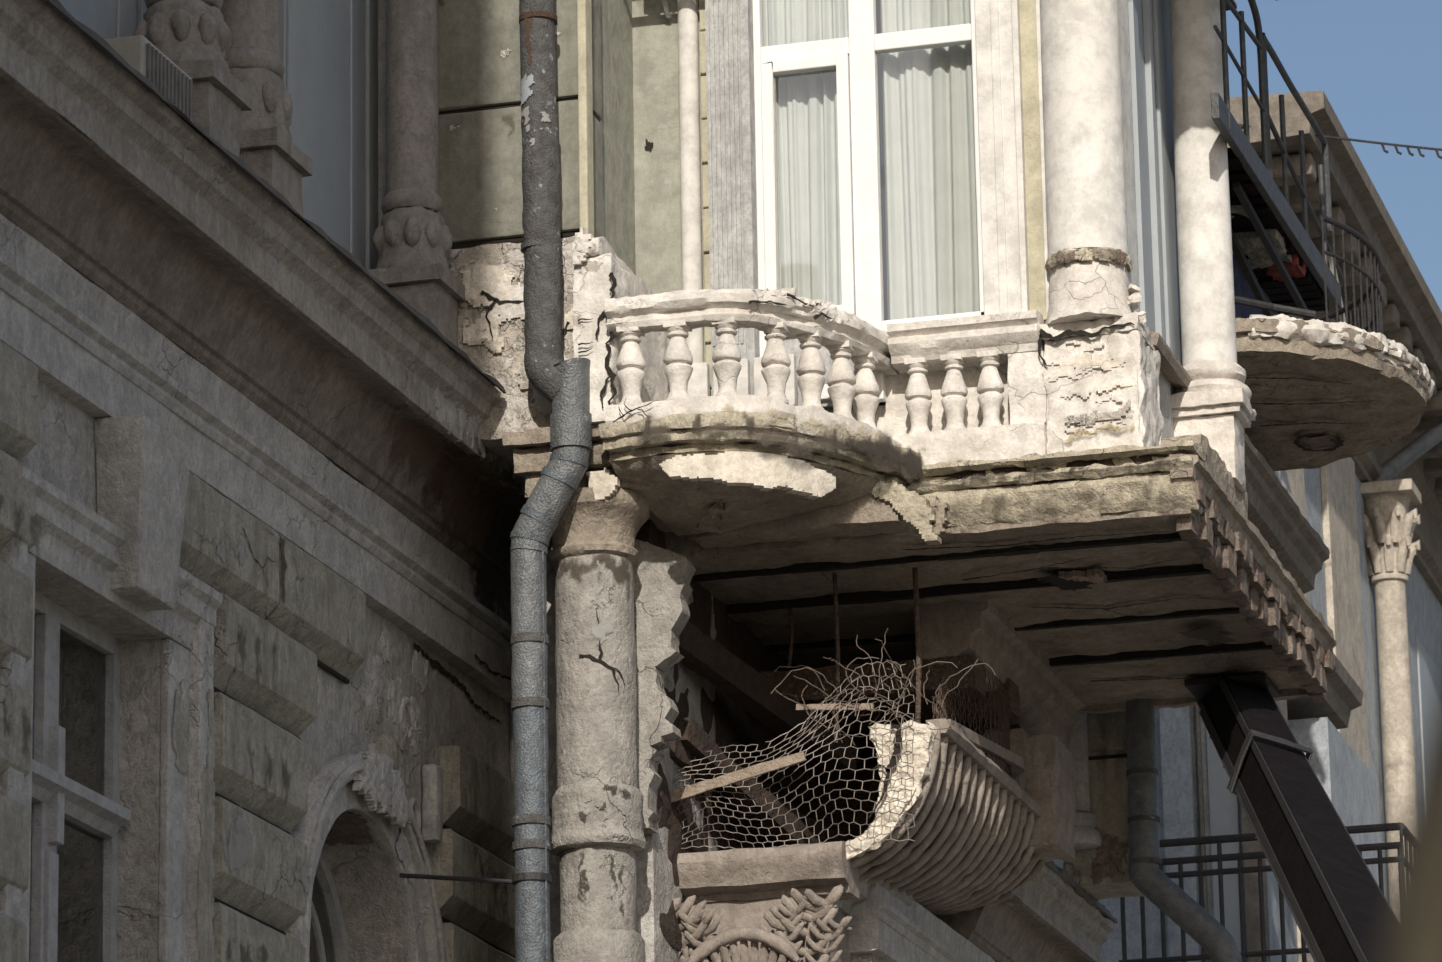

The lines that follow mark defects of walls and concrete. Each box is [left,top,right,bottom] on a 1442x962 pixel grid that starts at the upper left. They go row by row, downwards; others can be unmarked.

peeling [521,74,551,146]
flaking render [572,227,594,266]
flaking render [461,260,525,354]
flaking render [562,309,573,330]
spalling [1046,247,1147,326]
flaking render [1046,341,1137,442]
spalling [635,519,666,549]
spalling [659,451,836,500]
spalling [871,479,950,545]
crack [902,531,1224,616]
crack [579,609,625,690]
spalling [657,567,1021,953]